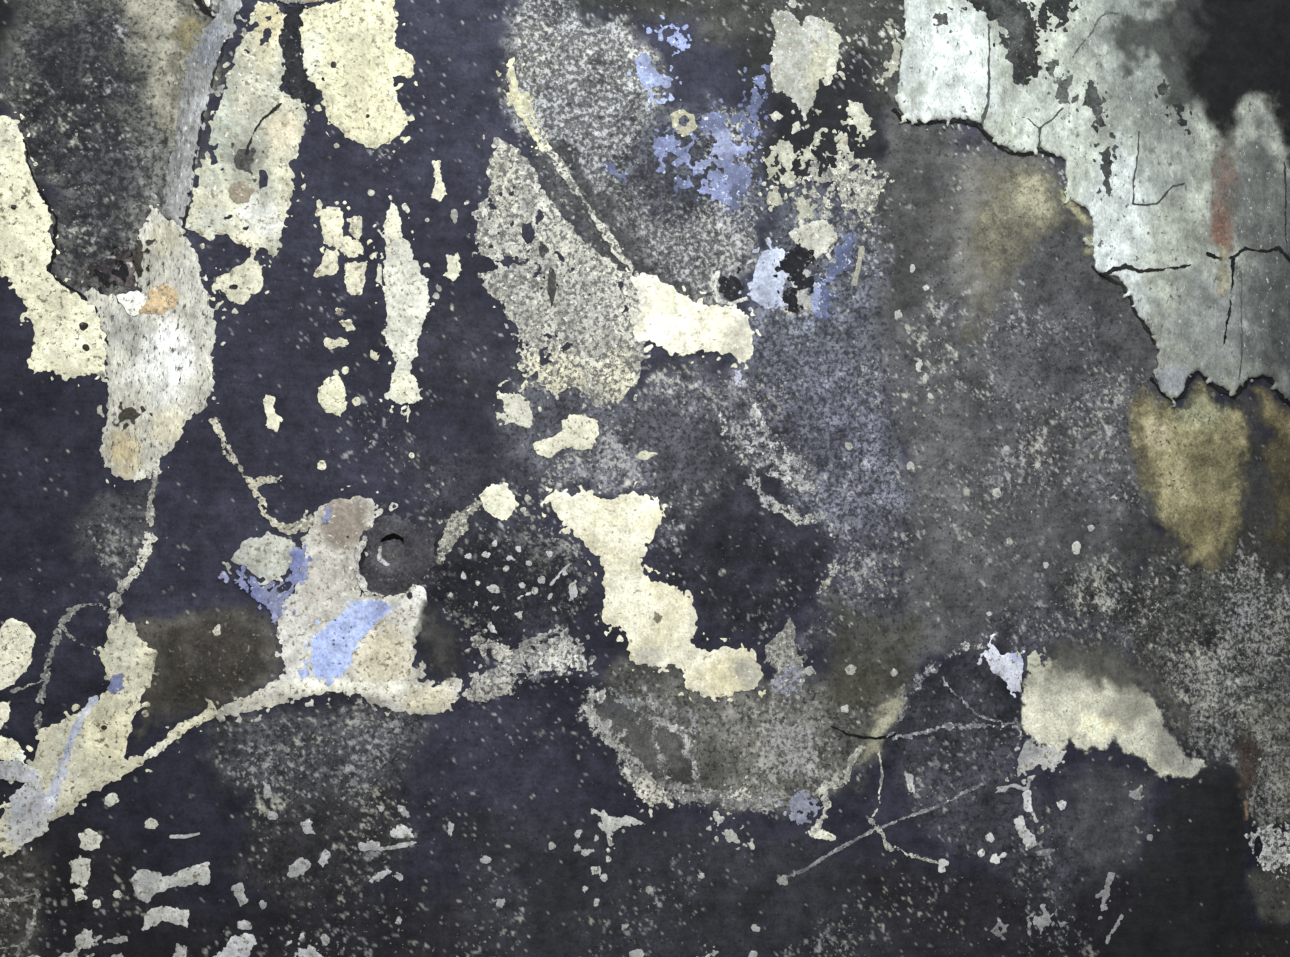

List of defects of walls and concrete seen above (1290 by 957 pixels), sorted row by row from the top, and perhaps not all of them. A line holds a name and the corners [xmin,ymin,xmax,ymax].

flaking render [0,0,761,487]
spalling [723,0,894,326]
crack [892,23,1064,157]
spalling [875,0,1290,409]
crack [1072,11,1119,58]
crack [1132,131,1185,206]
crack [1091,161,1290,407]
water stain [1130,382,1290,572]
flaking render [0,486,468,878]
flaking render [436,480,816,710]
crack [810,676,1022,864]
flaking render [995,647,1206,865]